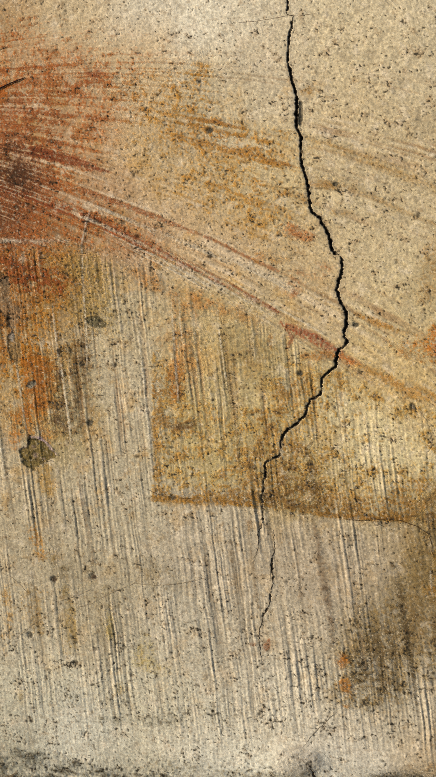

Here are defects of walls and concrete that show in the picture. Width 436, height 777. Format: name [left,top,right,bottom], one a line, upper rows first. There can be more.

rust [0,17,199,450]
flaking render [0,277,22,364]
crack [238,0,348,660]
rust [281,322,361,365]
rust [407,324,436,362]
spalling [19,435,56,470]